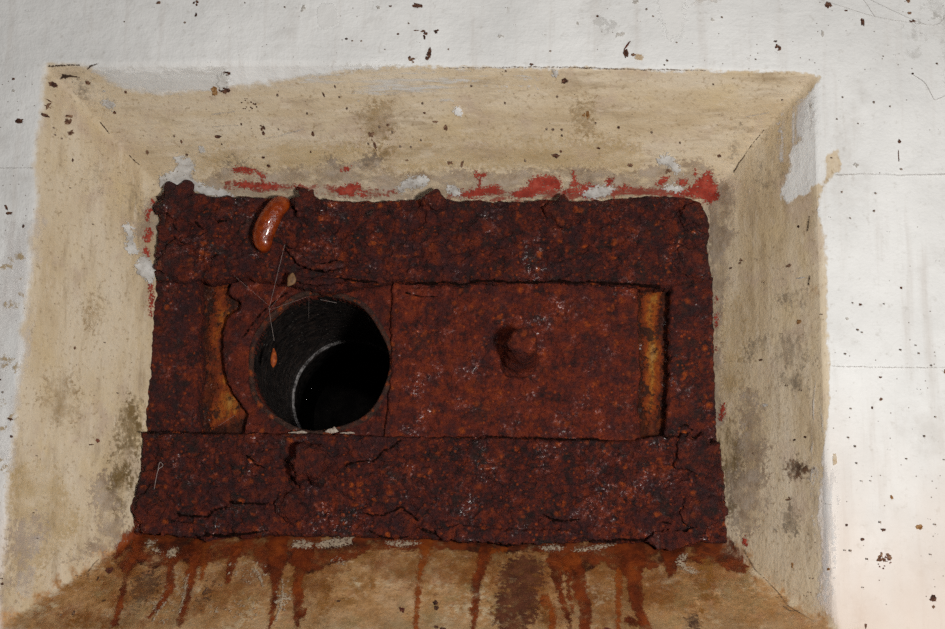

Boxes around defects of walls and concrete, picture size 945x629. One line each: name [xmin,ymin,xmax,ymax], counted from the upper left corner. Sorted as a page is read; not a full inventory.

peeling [122,132,743,332]
mould [106,466,133,518]
mould [108,392,142,461]
rust [205,284,248,431]
rust [638,291,665,437]
peeling [715,383,727,428]
mould [783,459,814,479]
rust [108,526,749,629]